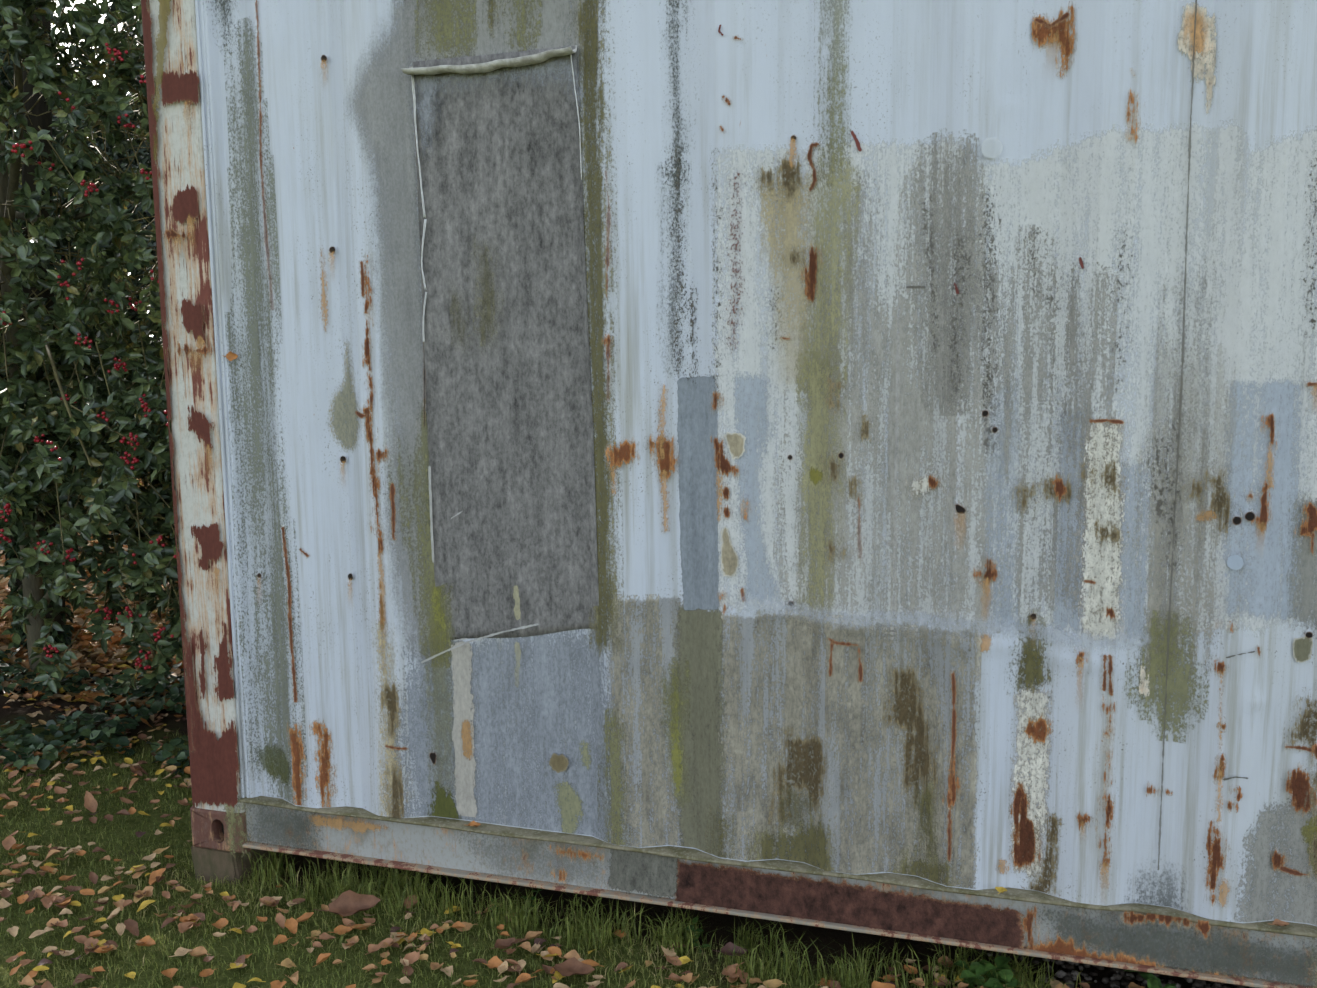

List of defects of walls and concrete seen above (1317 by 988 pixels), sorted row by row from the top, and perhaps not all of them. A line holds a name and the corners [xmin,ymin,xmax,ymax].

corrosion [1032,6,1075,77]
peeling [1178,3,1217,114]
damp [661,0,689,378]
corrosion [177,343,212,356]
corrosion [606,385,677,531]
corrosion [281,527,309,702]
corrosion [287,249,414,834]
damp [908,781,947,856]
corrosion [1206,647,1260,907]
corrosion [1272,696,1317,878]
corrosion [675,859,1164,968]